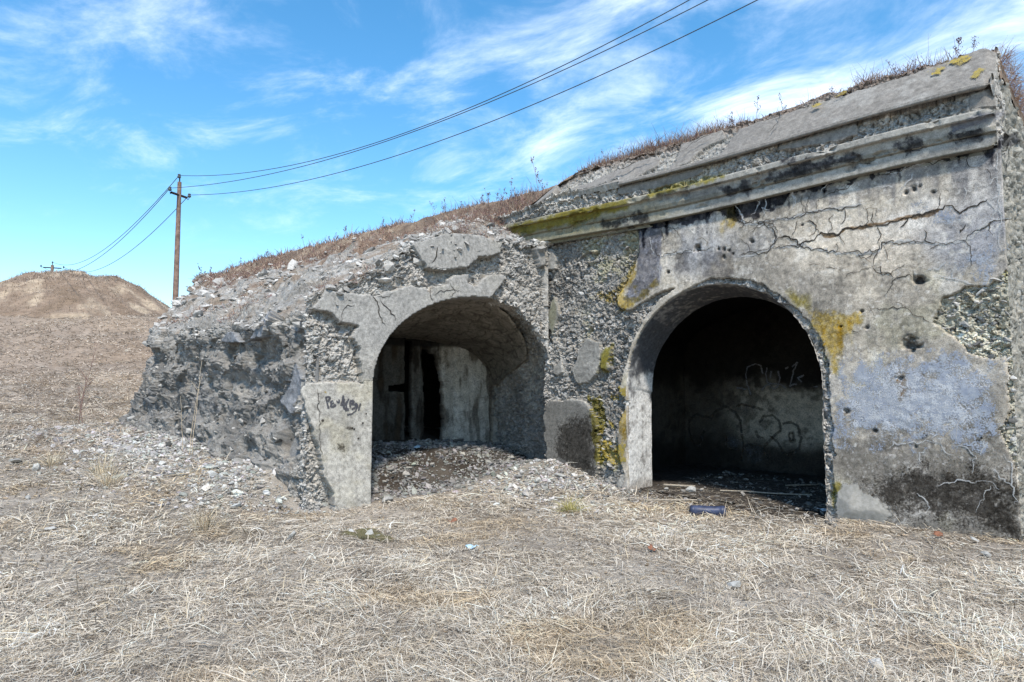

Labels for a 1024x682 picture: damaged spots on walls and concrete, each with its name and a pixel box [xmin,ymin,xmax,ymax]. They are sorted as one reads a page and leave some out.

water stain [895,137,923,154]
crack [655,219,713,258]
water stain [601,152,913,276]
crack [737,157,1010,333]
crack [340,293,396,326]
spalling [118,229,1020,519]
water stain [556,412,603,477]
water stain [862,415,1024,540]